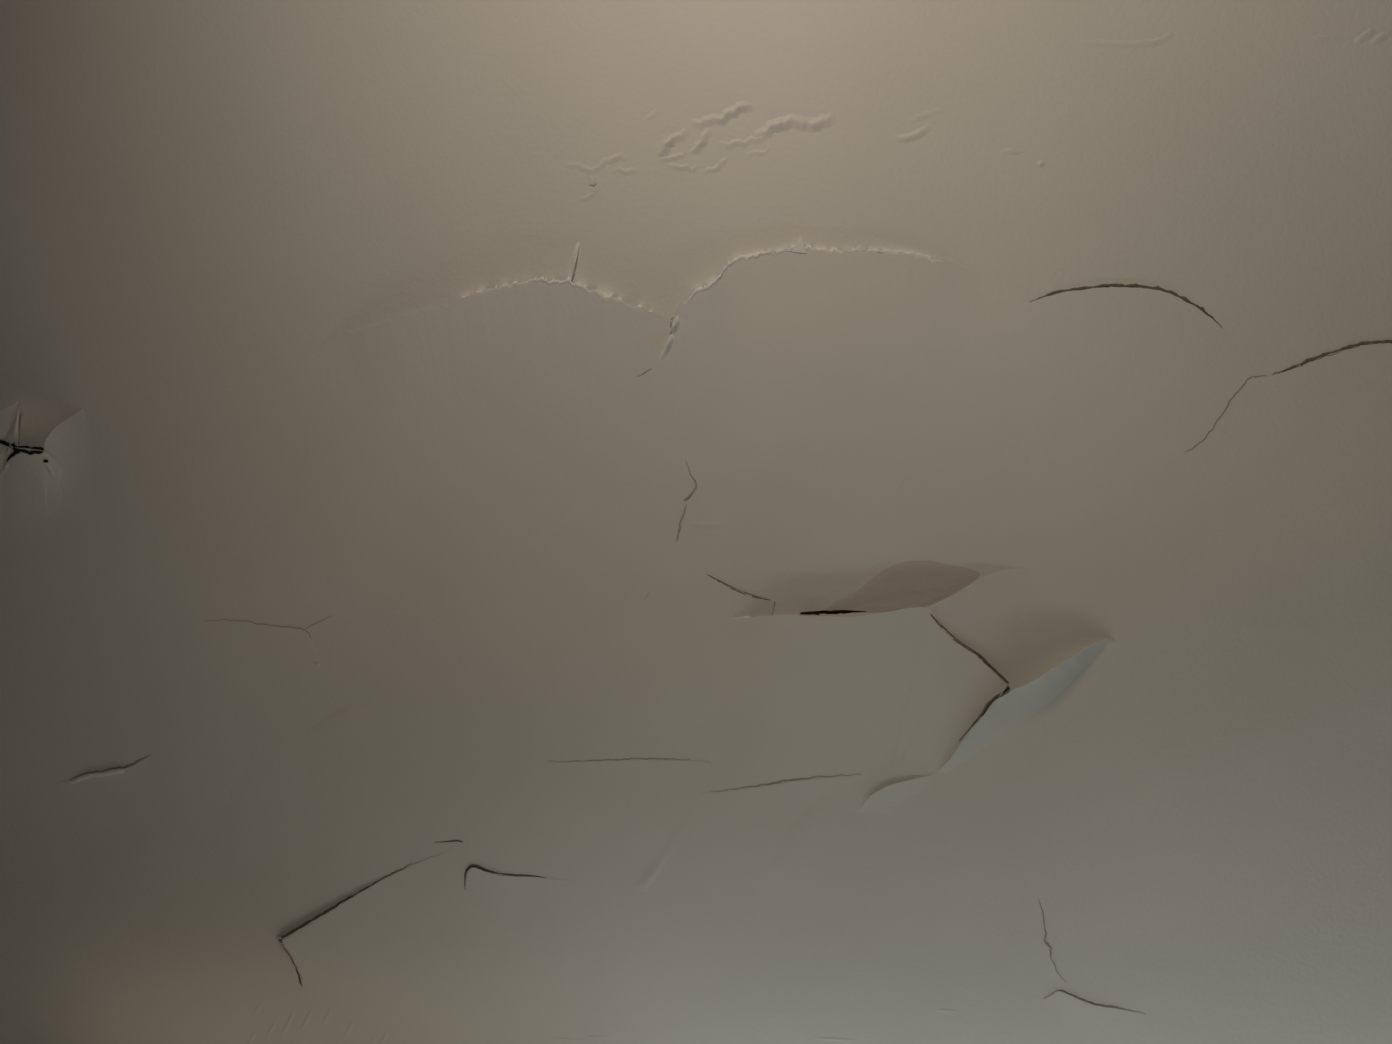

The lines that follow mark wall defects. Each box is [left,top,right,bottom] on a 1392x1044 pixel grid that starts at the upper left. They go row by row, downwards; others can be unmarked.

crack [41,755,152,795]
crack [276,840,572,1001]